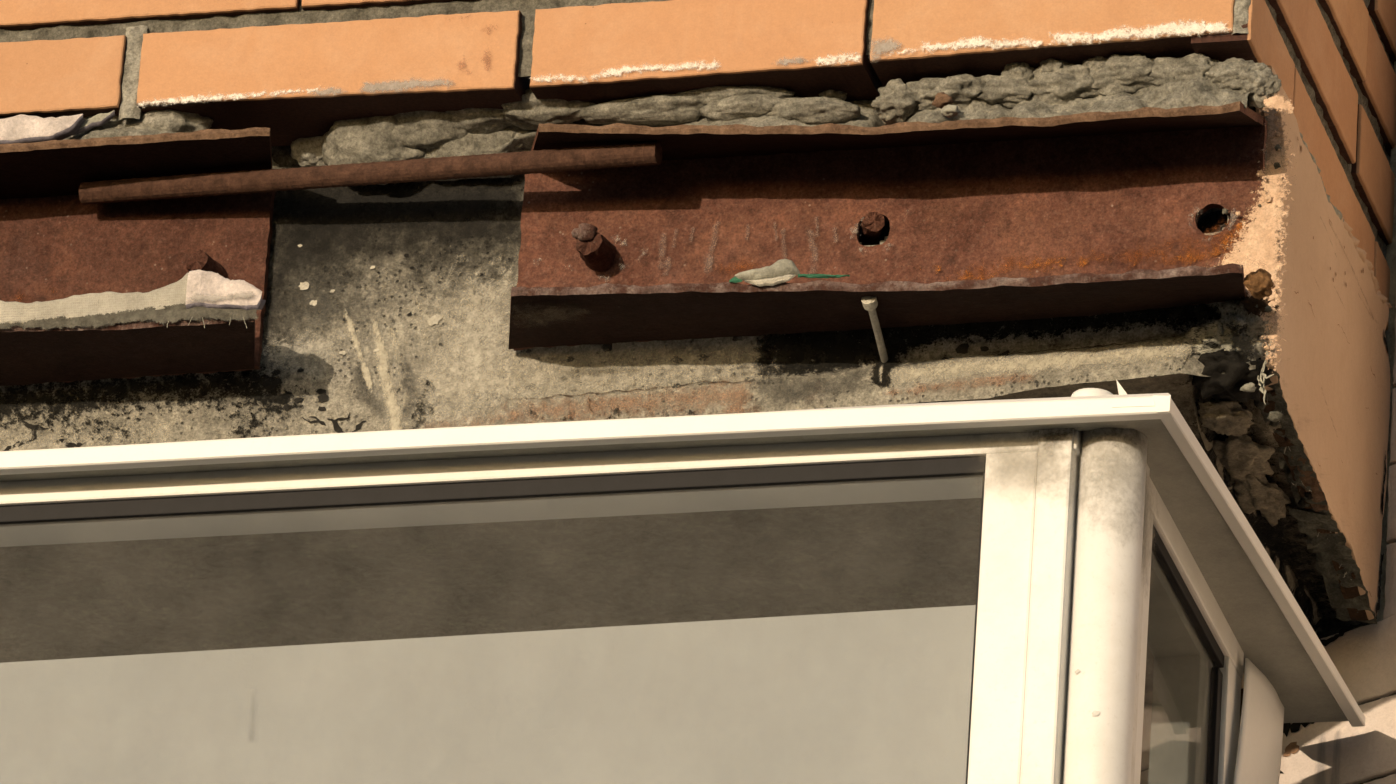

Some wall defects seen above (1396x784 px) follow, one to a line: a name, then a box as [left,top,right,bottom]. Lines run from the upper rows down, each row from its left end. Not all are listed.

flaking render [0,110,115,144]
flaking render [0,270,266,330]
leakage [0,263,1238,451]
spalling [1185,296,1291,527]
corrosion [1243,268,1274,300]
leakage [1189,398,1344,639]